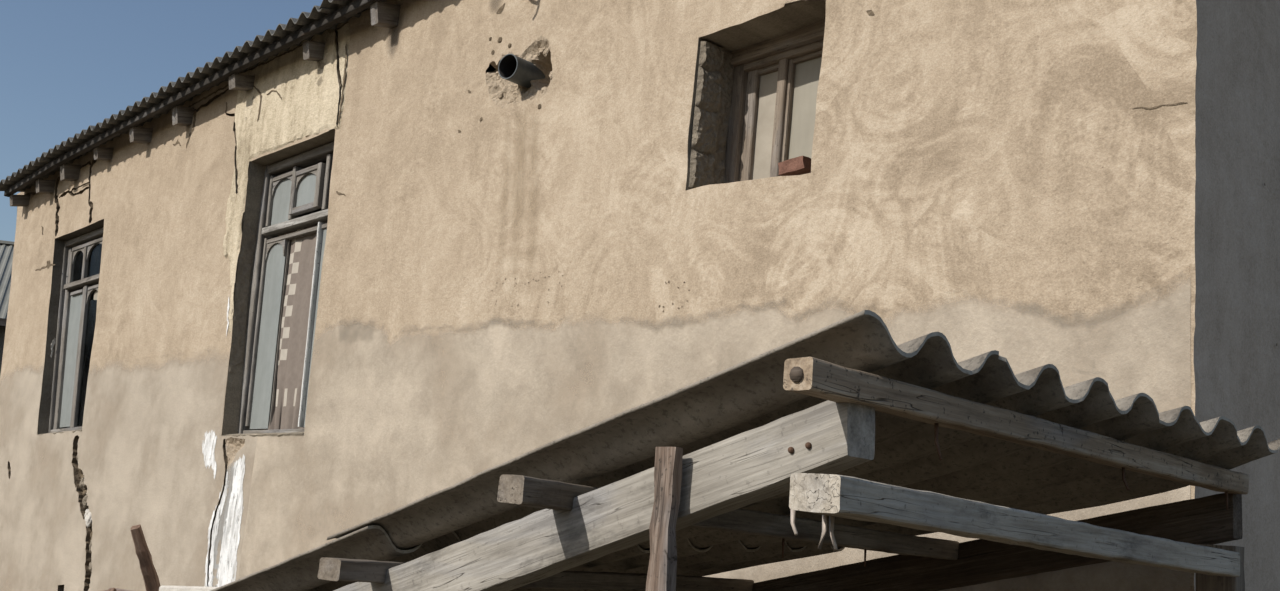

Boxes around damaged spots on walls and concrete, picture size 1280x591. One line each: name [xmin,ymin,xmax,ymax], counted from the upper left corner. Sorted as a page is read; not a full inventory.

crack [173,21,349,194]
spalling [485,36,553,109]
crack [24,159,97,271]
peeling [202,431,218,479]
crack [72,436,93,591]